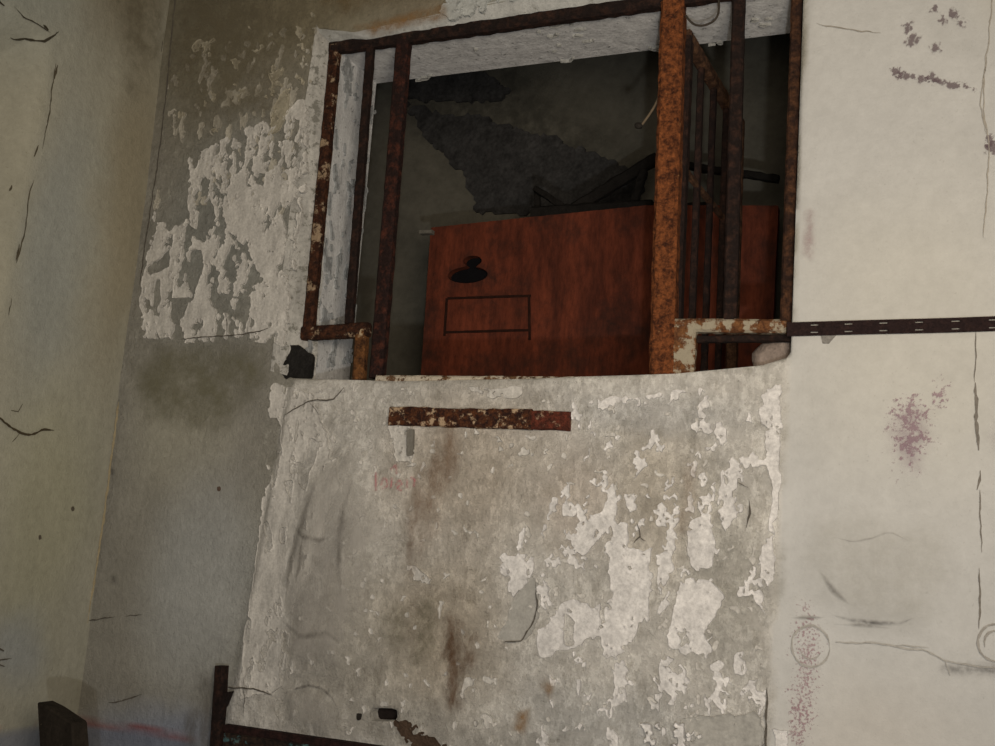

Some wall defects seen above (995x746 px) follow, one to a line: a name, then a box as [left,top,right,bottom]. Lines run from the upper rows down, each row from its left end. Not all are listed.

crack [0,1,58,43]
crack [34,65,58,157]
crack [980,0,993,238]
crack [9,181,34,263]
peeling [319,118,370,325]
peeling [139,12,353,699]
crack [0,404,53,442]
peeling [334,409,436,478]
rust [388,406,572,432]
crack [974,337,983,622]
peeling [487,385,784,746]
peeling [460,675,498,699]